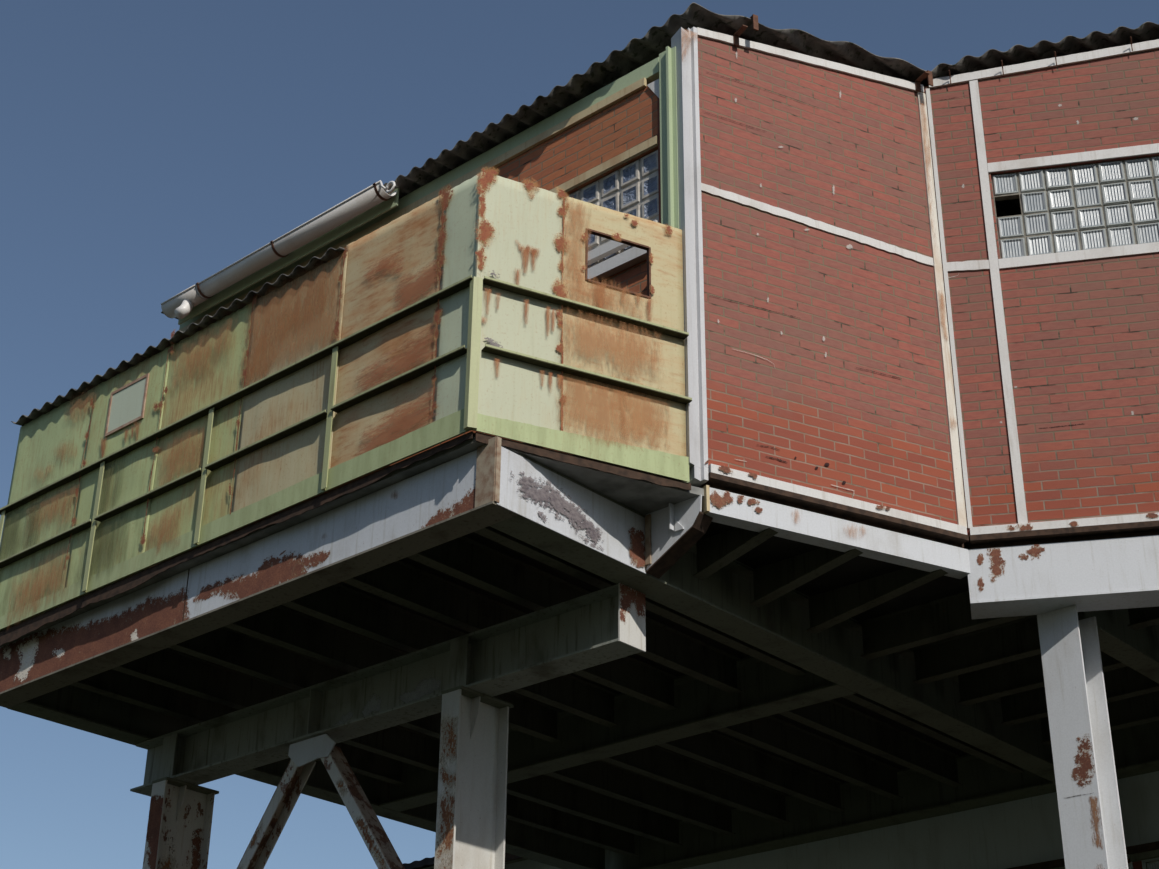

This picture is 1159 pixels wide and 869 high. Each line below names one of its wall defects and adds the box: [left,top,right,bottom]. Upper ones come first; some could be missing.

corrosion [475,167,498,270]
corrosion [542,190,659,441]
peeling [510,471,604,550]
corrosion [710,490,763,513]
corrosion [977,548,1005,592]
corrosion [1019,544,1045,560]
peeling [3,635,65,683]
corrosion [0,550,330,692]
corrosion [146,795,171,869]
corrosion [356,819,386,869]
corrosion [437,718,457,869]
corrosion [1072,736,1103,848]